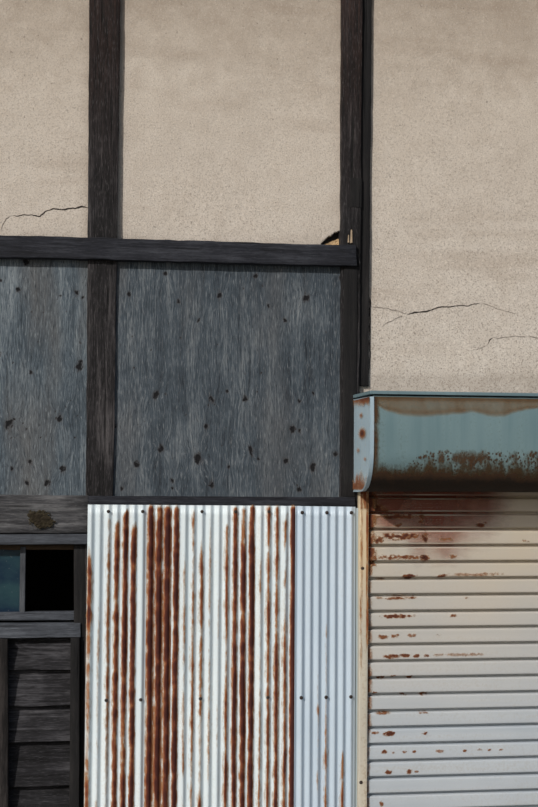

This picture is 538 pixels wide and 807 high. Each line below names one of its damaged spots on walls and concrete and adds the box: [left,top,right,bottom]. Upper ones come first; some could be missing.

crack [1,206,88,229]
crack [369,299,514,371]
rust [84,505,211,807]
rust [222,505,295,807]
rust [353,450,538,736]